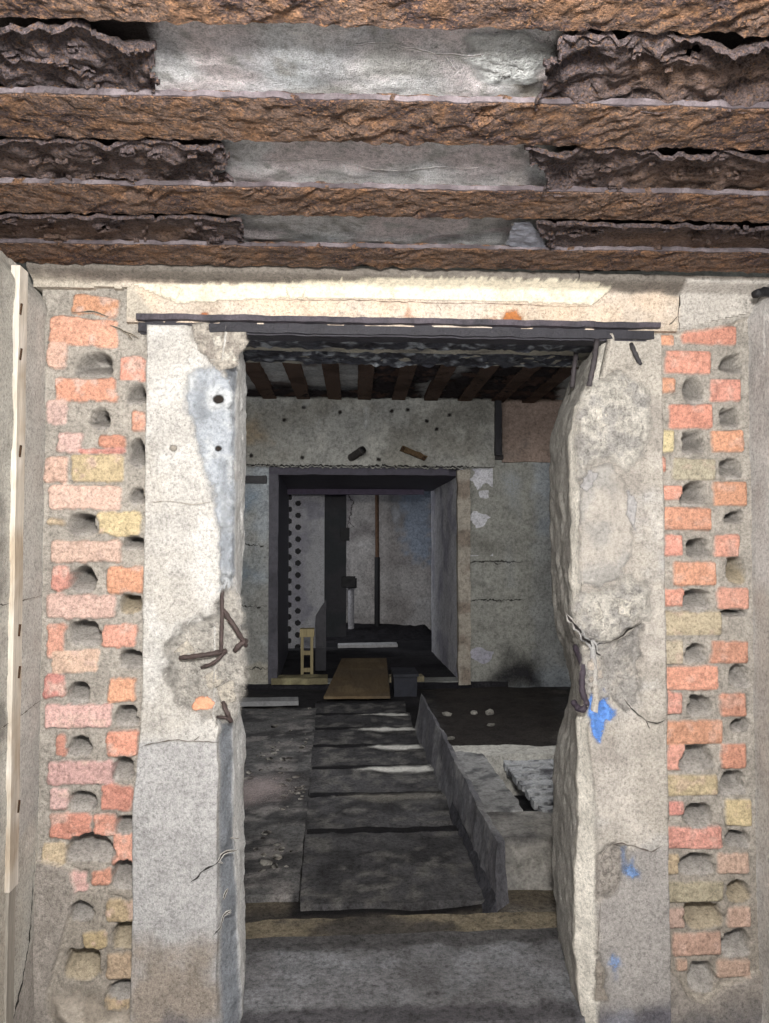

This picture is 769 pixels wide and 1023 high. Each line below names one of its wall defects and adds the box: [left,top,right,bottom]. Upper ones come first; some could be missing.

rust [0,19,160,100]
rust [534,30,769,115]
rust [0,137,234,188]
rust [524,145,769,198]
rust [0,212,244,246]
rust [536,220,769,254]
spalling [192,322,248,370]
spalling [569,339,652,713]
spalling [164,587,249,723]